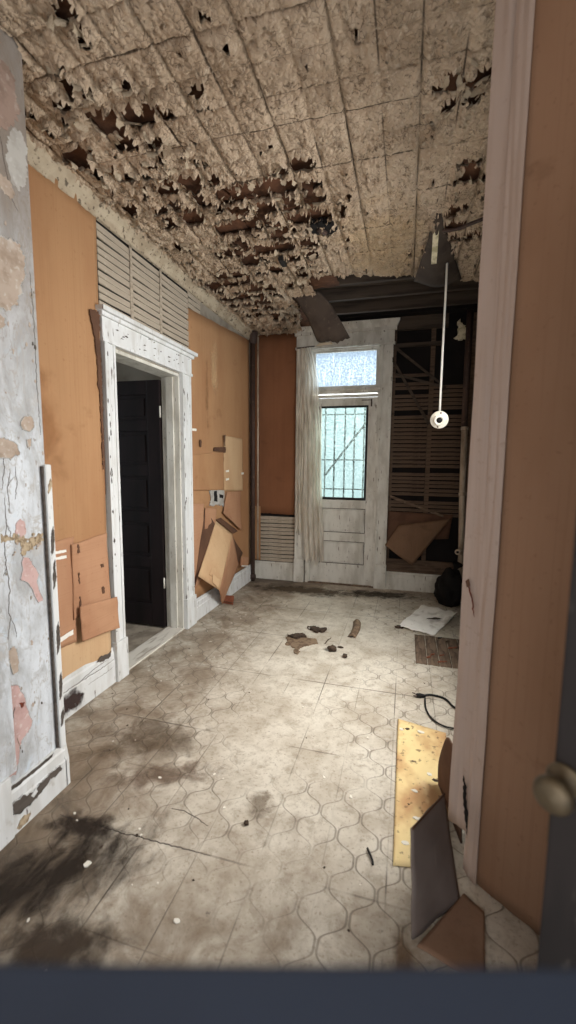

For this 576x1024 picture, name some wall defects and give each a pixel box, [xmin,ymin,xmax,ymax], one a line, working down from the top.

peeling [46,0,92,50]
peeling [422,57,492,149]
peeling [25,64,344,334]
peeling [444,157,486,260]
peeling [0,221,35,329]
spalling [96,220,200,364]
peeling [0,416,44,465]
peeling [0,519,57,603]
peeling [9,646,43,777]
spalling [12,765,63,830]